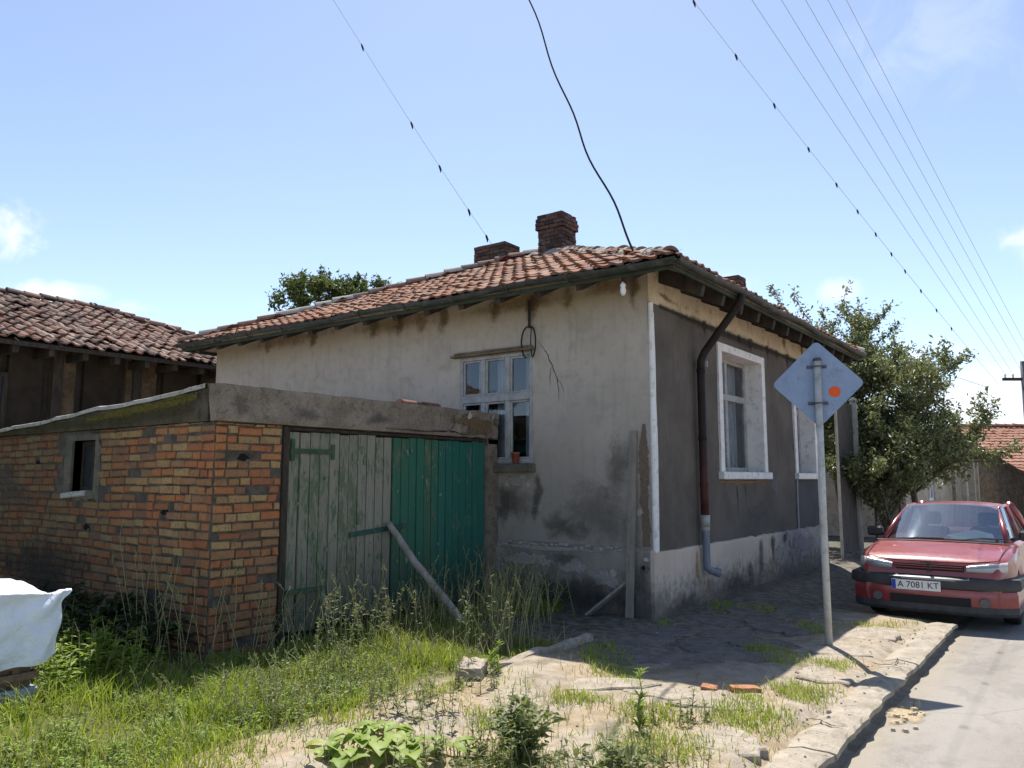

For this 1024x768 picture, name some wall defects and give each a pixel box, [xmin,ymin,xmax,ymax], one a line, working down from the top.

spalling [499,540,626,589]